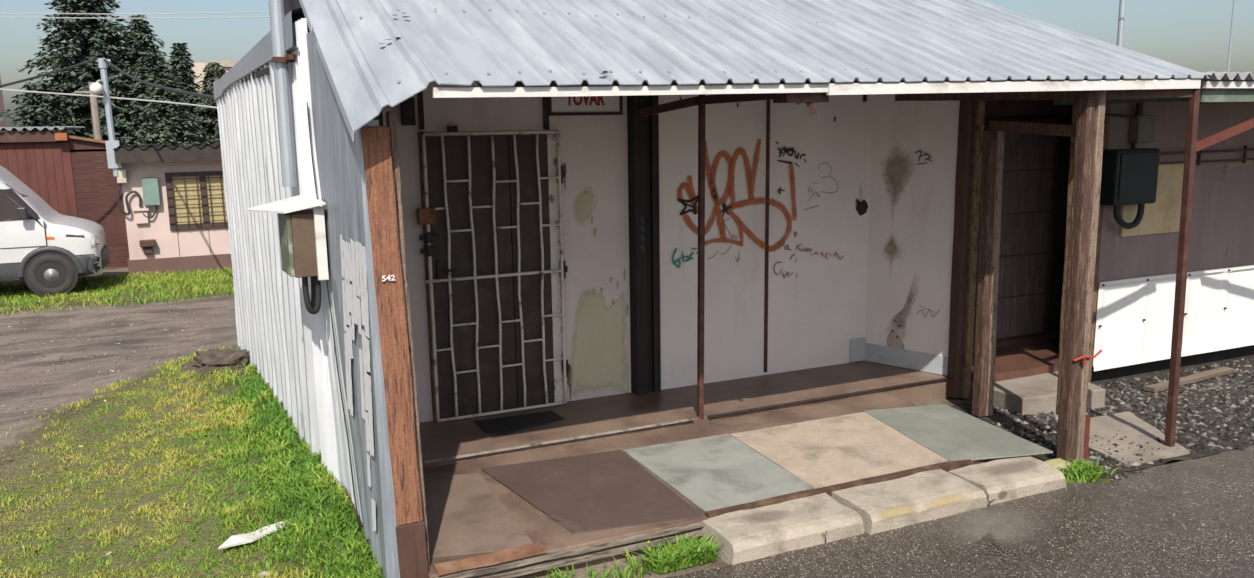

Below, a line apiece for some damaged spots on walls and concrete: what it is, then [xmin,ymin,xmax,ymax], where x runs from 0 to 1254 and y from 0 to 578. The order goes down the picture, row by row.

damp [885,157,909,219]
peeling [571,269,628,393]
damp [892,293,913,328]